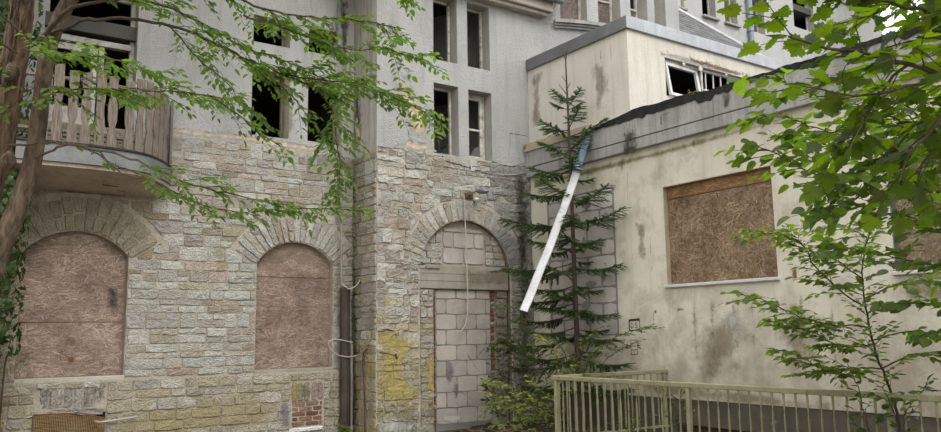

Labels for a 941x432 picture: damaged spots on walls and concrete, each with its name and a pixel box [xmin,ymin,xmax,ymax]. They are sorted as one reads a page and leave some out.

flaking render [289,381,323,432]